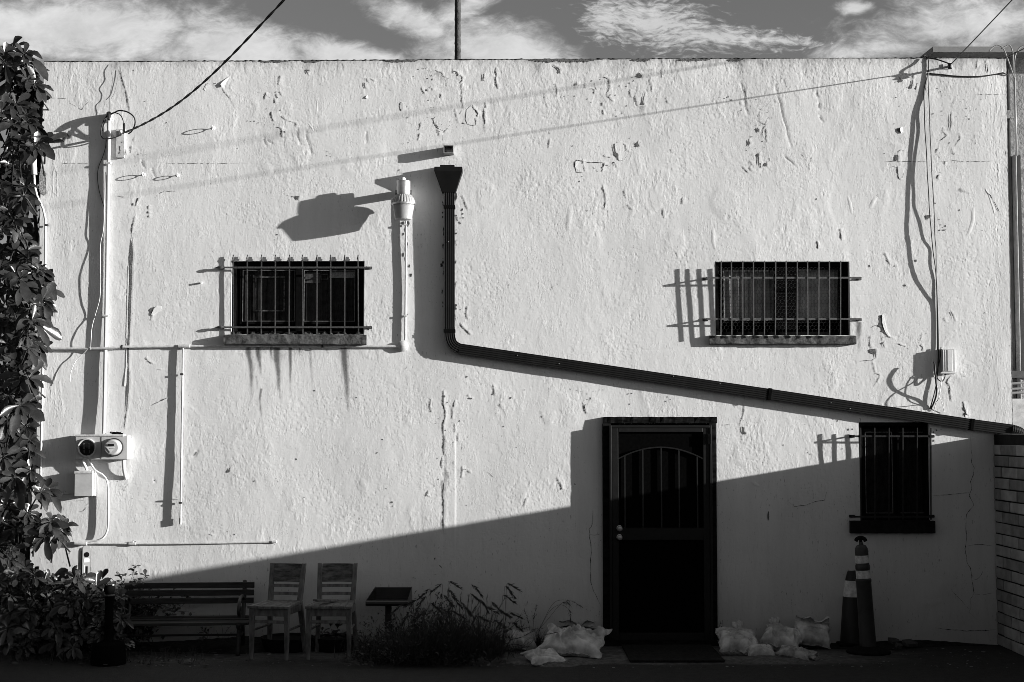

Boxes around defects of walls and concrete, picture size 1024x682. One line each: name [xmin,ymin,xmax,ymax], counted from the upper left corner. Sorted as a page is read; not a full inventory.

spalling [530,59,596,74]
peeling [607,138,640,167]
peeling [863,315,900,361]
damp [247,347,300,383]
crack [948,451,990,601]